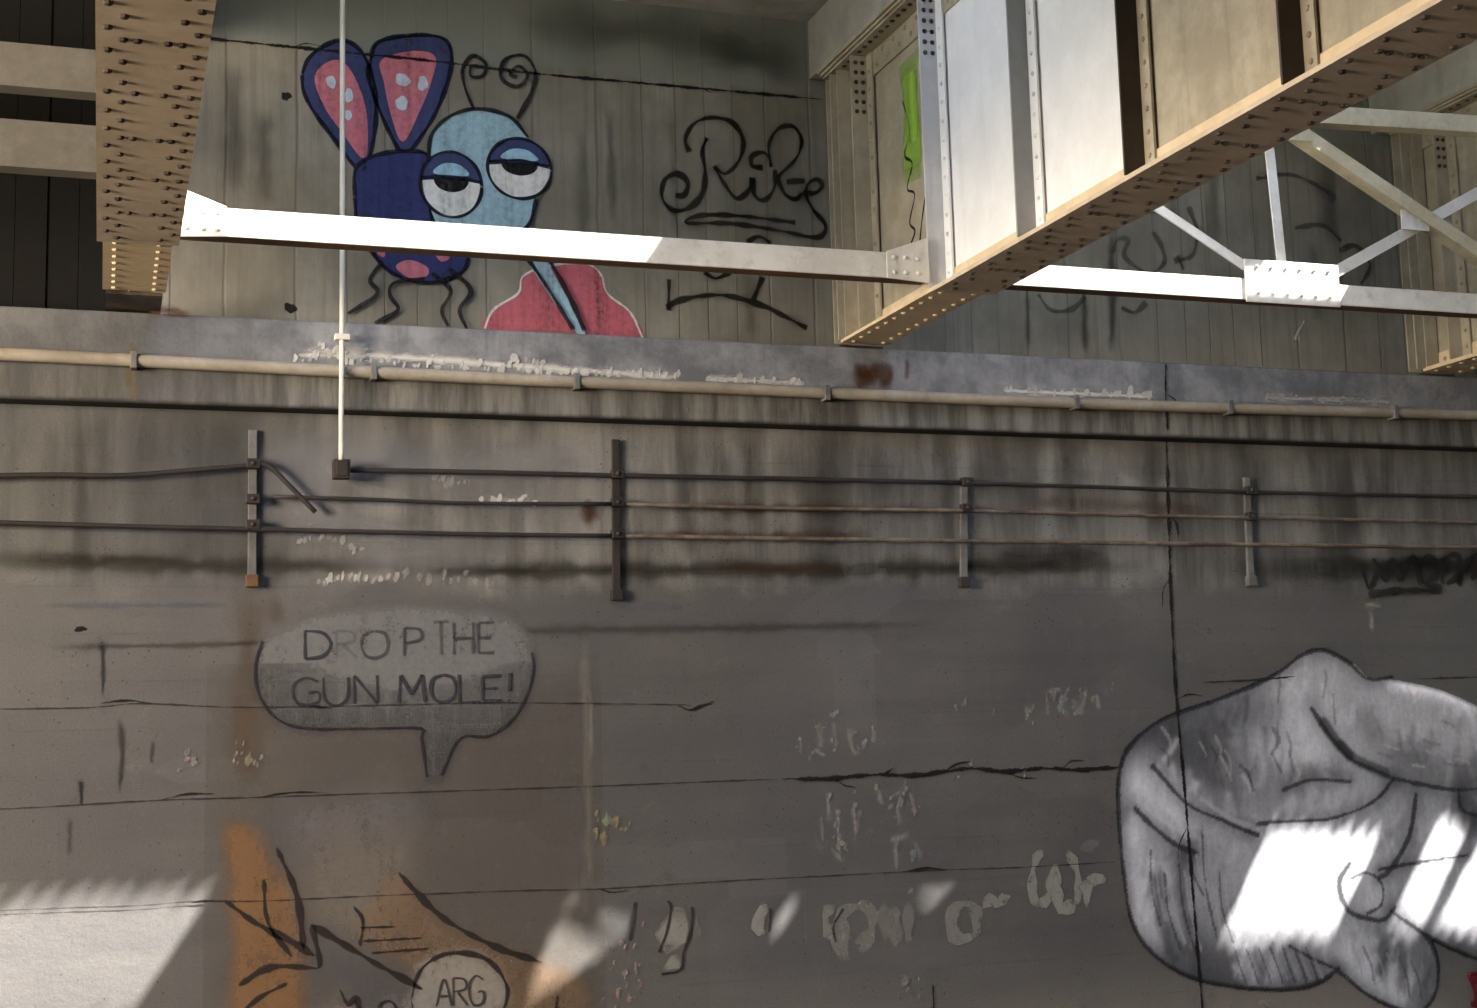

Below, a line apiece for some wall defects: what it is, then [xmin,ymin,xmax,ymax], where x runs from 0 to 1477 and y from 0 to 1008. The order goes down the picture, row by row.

rust [856,366,893,388]
water stain [488,561,1082,579]
crack [0,760,1124,809]